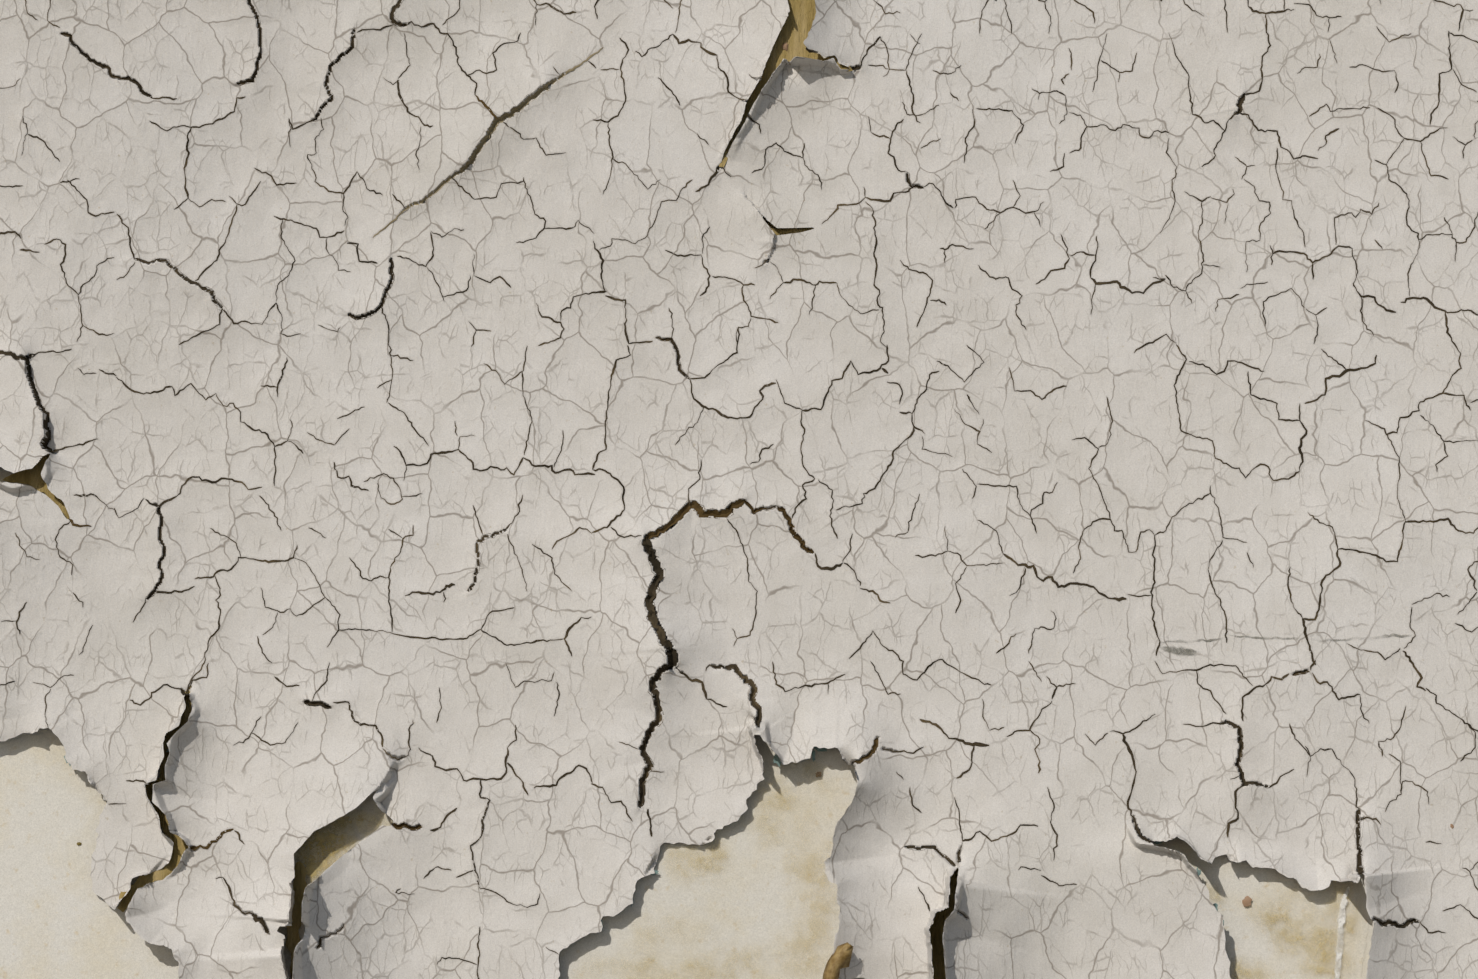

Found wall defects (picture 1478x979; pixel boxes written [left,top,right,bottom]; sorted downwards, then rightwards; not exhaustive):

crack [0,0,1077,979]
peeling [0,248,1448,979]
crack [900,0,1478,874]
crack [1373,841,1478,934]